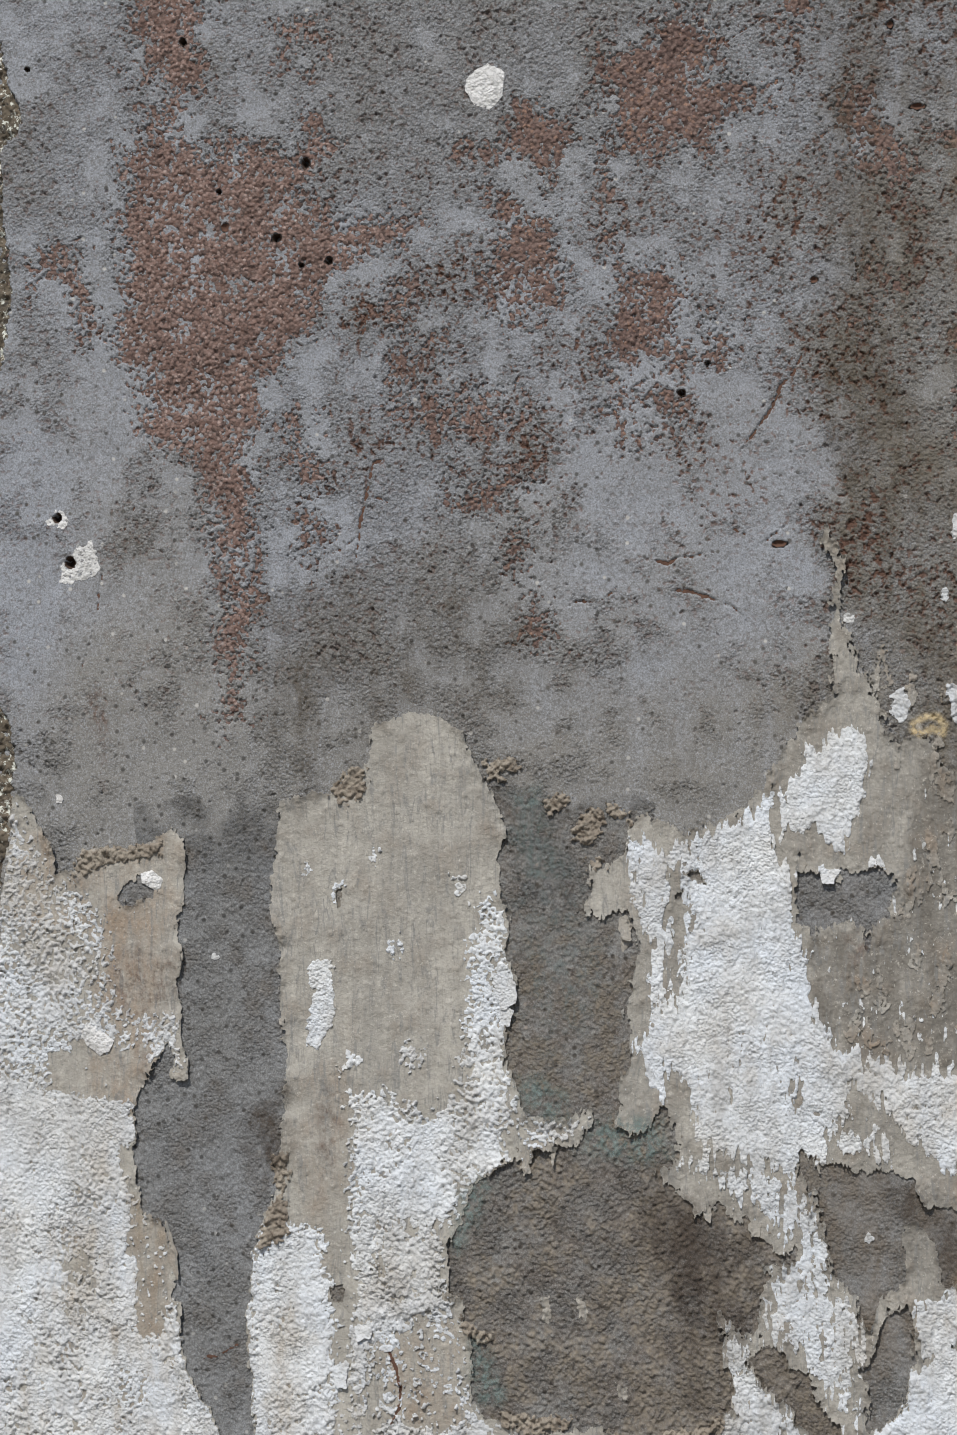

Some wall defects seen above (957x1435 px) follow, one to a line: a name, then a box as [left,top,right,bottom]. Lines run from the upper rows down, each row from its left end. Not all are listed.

spalling [0,0,833,748]
spalling [807,68,957,216]
spalling [834,231,957,358]
peeling [0,524,957,1435]